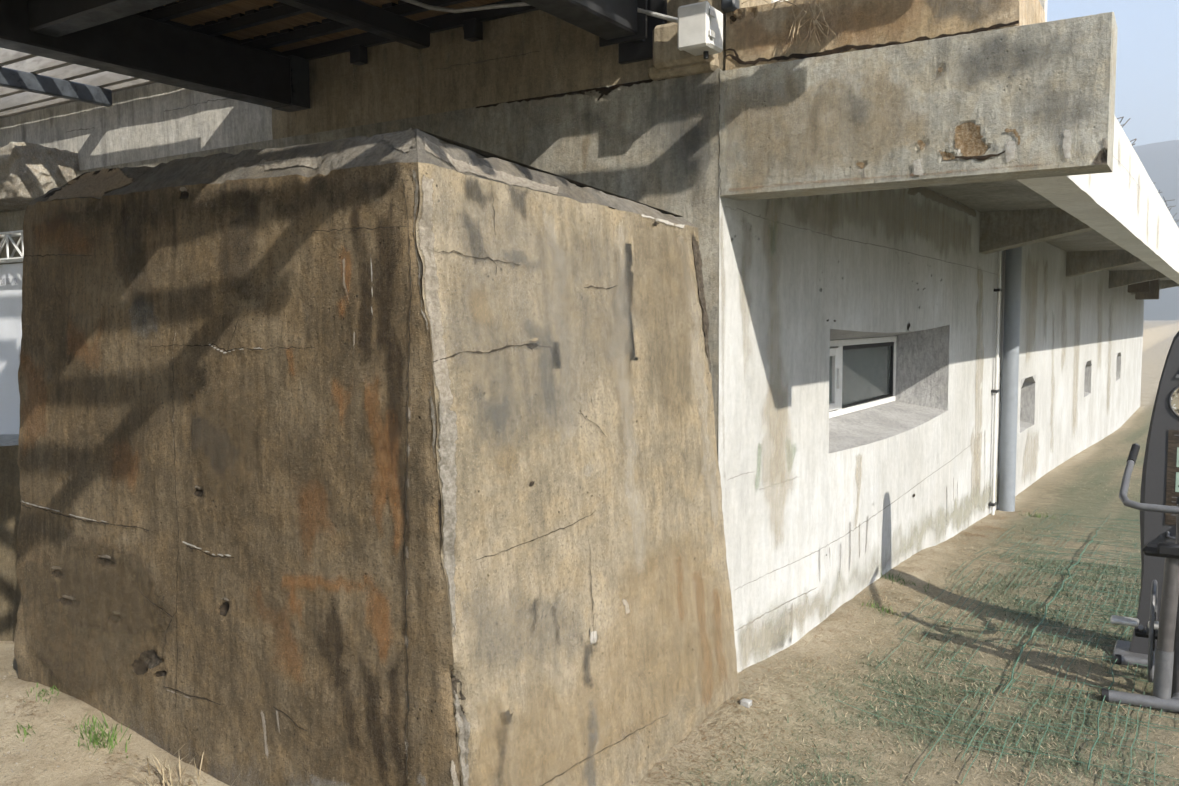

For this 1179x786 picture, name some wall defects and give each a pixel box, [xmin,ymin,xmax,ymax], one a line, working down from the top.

crack [725,20,1019,65]
crack [476,76,682,108]
spalling [939,122,1020,162]
crack [314,179,552,786]
crack [476,510,596,639]
leakage [261,710,280,756]
crack [542,715,667,786]